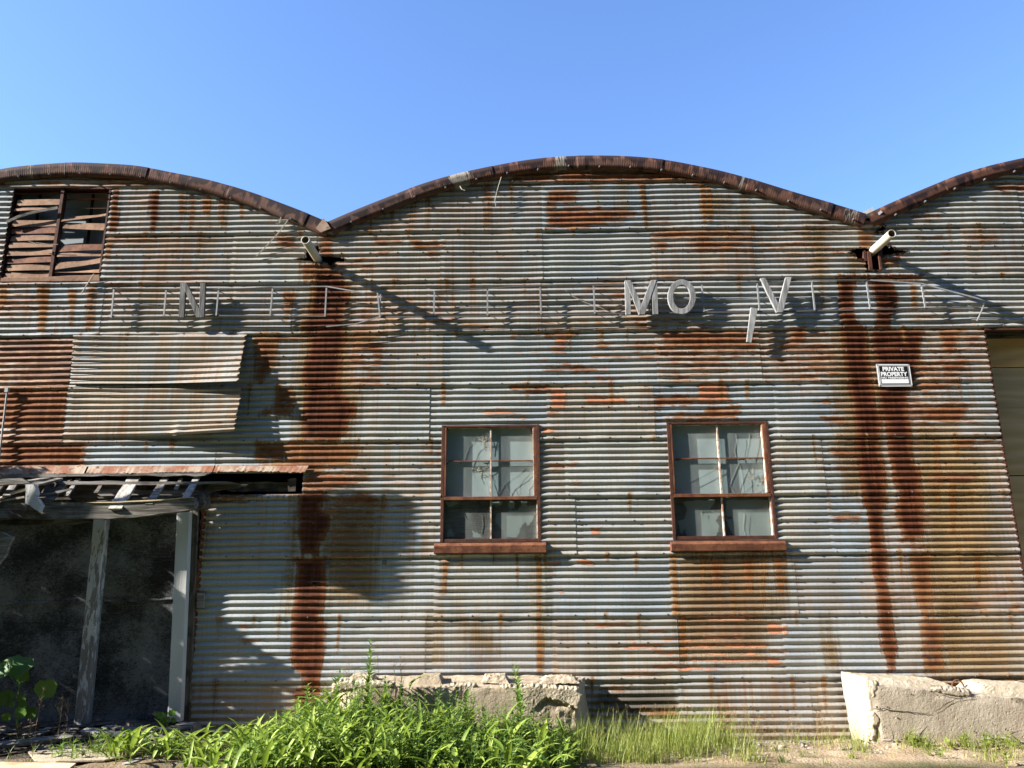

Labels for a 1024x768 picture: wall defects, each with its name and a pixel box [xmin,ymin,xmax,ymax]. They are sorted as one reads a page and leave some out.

rust [104,189,121,260]
rust [143,190,159,238]
rust [178,194,243,253]
rust [274,230,302,248]
rust [360,197,446,272]
rust [509,170,754,254]
rust [988,181,1024,194]
rust [0,381,88,474]
rust [247,236,385,707]
rust [653,379,749,422]
rust [808,230,980,676]
rust [669,552,798,662]